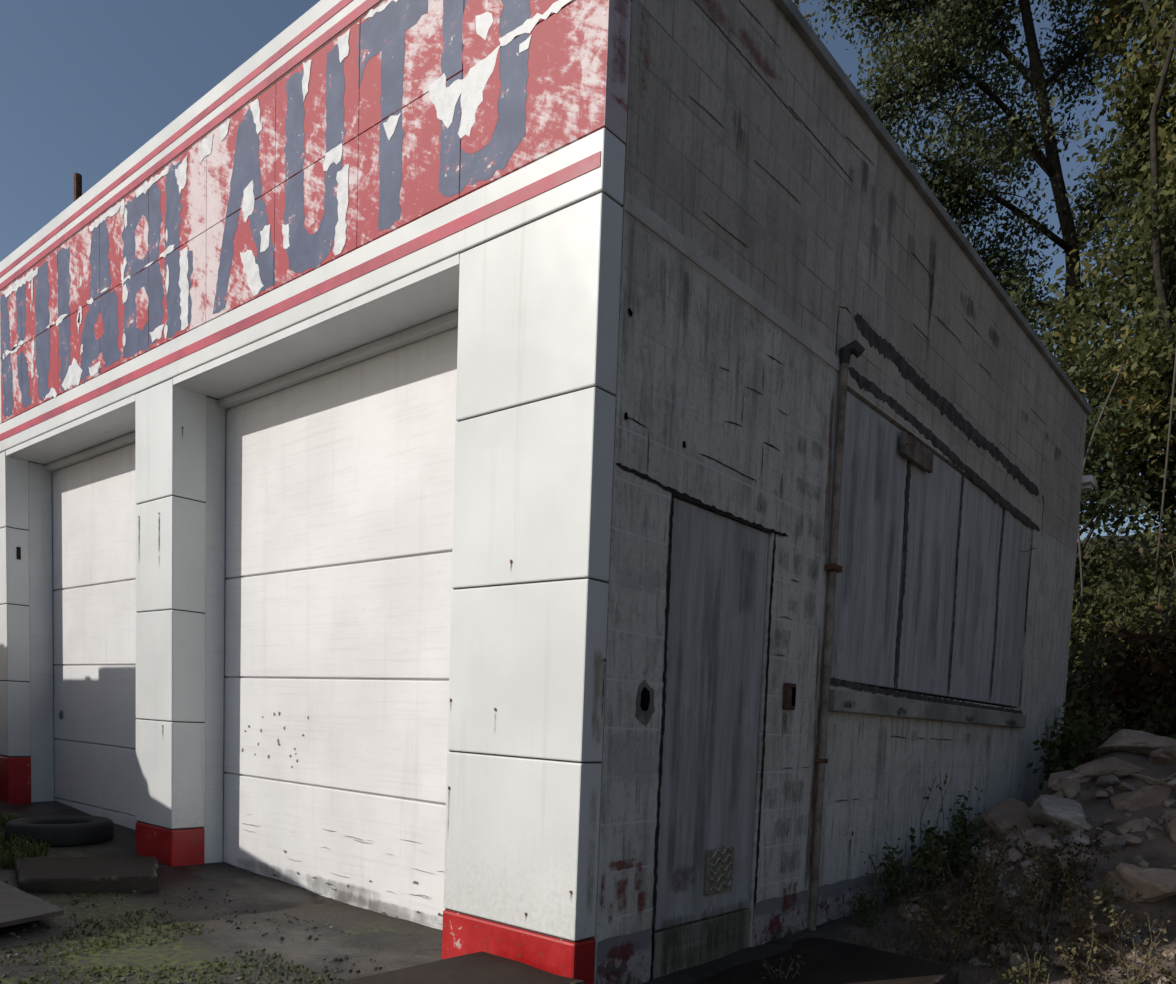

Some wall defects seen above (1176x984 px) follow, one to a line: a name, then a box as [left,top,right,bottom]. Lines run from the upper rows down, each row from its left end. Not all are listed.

peeling [89,119,230,231]
peeling [242,180,254,221]
peeling [302,59,312,102]
peeling [323,143,349,256]
peeling [337,0,398,63]
peeling [383,113,401,140]
peeling [429,0,571,139]
peeling [3,267,39,307]
peeling [45,257,131,400]
peeling [145,229,189,342]
peeling [240,224,290,296]
corrosion [805,648,833,884]